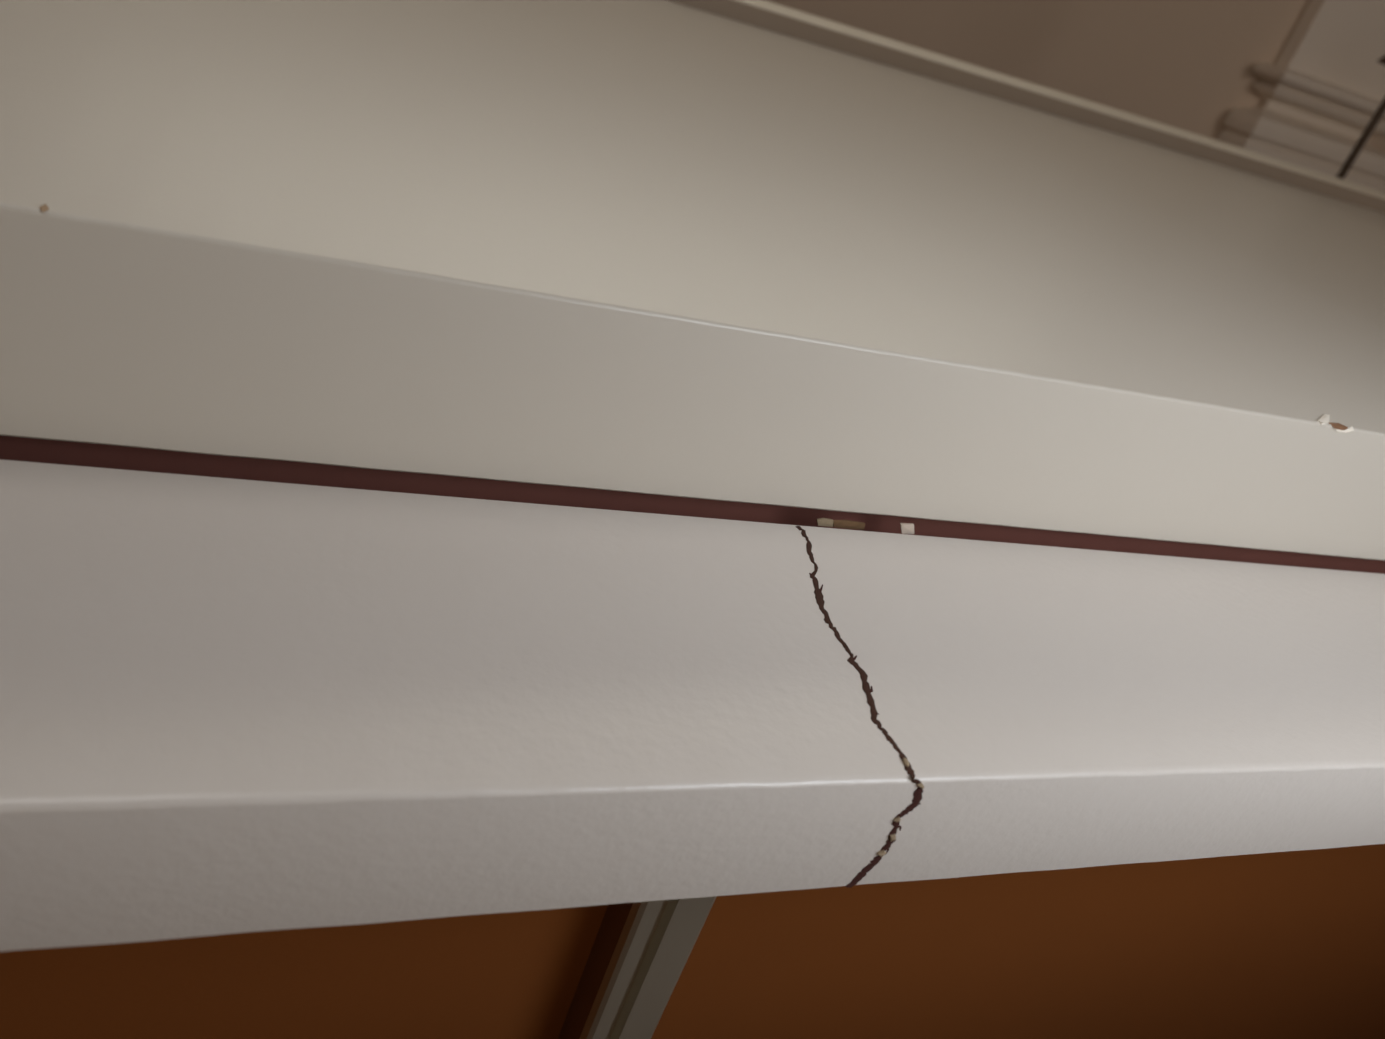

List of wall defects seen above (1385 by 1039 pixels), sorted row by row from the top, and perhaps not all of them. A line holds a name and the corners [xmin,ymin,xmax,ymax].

crack [796,526,925,888]